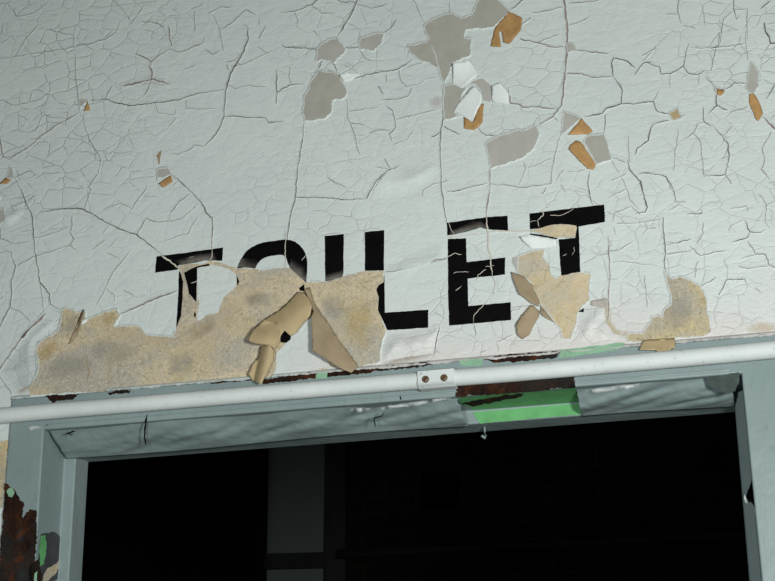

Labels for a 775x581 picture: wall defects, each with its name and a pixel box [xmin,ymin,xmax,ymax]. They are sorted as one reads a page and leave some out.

peeling [301,36,360,122]
peeling [358,31,385,52]
peeling [406,0,522,130]
peeling [744,61,763,121]
peeling [484,123,541,169]
peeling [560,109,613,170]
crack [0,0,775,395]
peeling [29,261,387,395]
peeling [511,224,713,358]
peeling [457,388,582,424]
peeling [0,439,8,508]
corrosion [0,483,42,581]